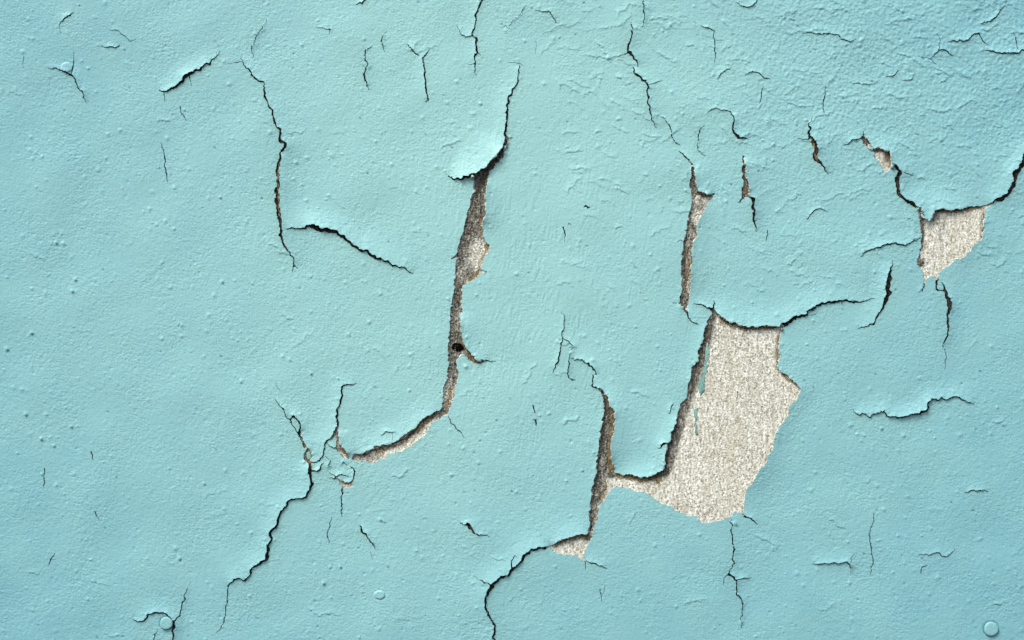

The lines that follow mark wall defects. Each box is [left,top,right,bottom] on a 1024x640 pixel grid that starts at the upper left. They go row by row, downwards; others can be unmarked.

crack [159,19,429,274]
peeling [304,62,522,517]
crack [618,0,664,126]
peeling [469,117,875,640]
crack [858,238,920,329]
crack [853,282,975,419]
peeling [844,127,1024,294]
crack [133,583,190,640]
crack [216,371,356,633]
crack [723,519,750,627]